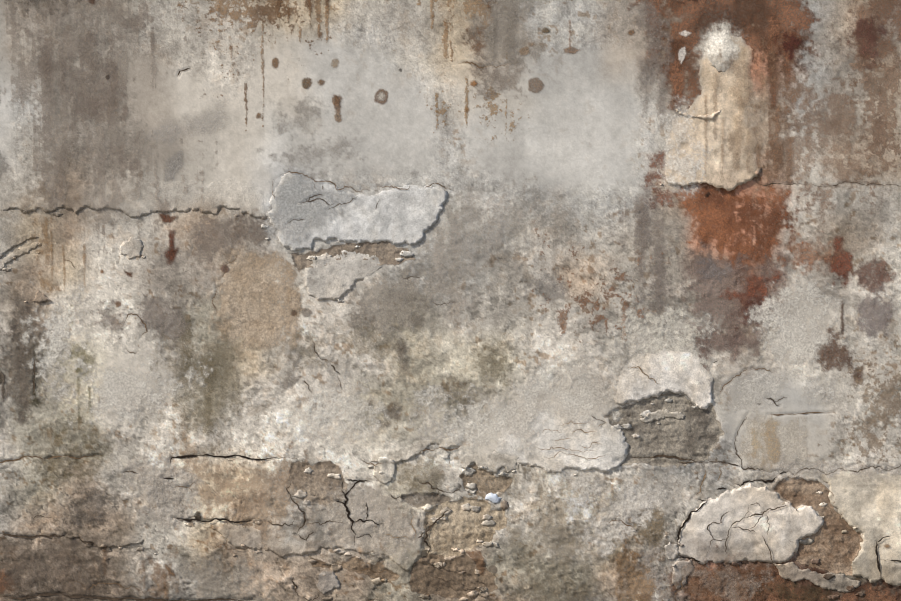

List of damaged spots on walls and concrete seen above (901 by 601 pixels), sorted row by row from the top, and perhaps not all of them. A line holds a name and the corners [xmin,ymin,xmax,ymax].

rust [196,0,339,131]
rust [332,96,341,122]
peeling [660,31,762,191]
rust [628,0,901,329]
damp [0,288,213,423]
peeling [0,173,448,303]
rust [532,240,656,341]
crack [164,454,297,493]
crack [177,461,485,594]
peeling [177,348,725,601]
rust [610,509,901,601]
peeling [664,469,901,600]